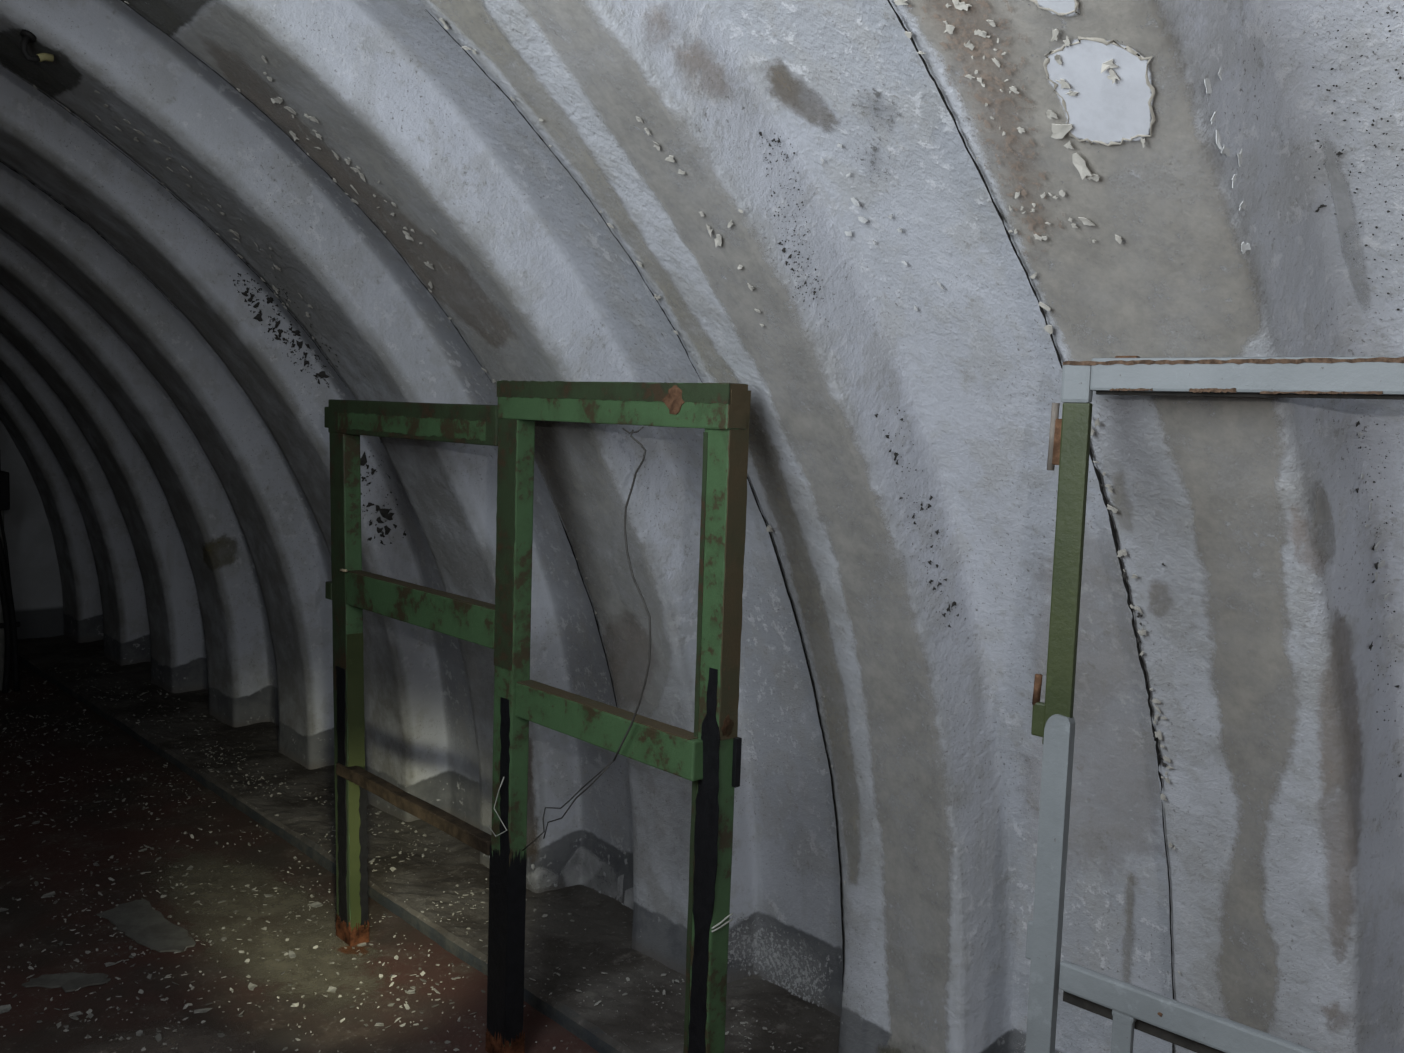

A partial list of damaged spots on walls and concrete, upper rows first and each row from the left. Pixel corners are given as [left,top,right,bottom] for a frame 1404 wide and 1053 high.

leakage [431,0,739,383]
peeling [1014,190,1066,241]
peeling [1068,216,1096,243]
leakage [907,0,1260,361]
leakage [518,0,951,1053]
leakage [1153,396,1295,1032]